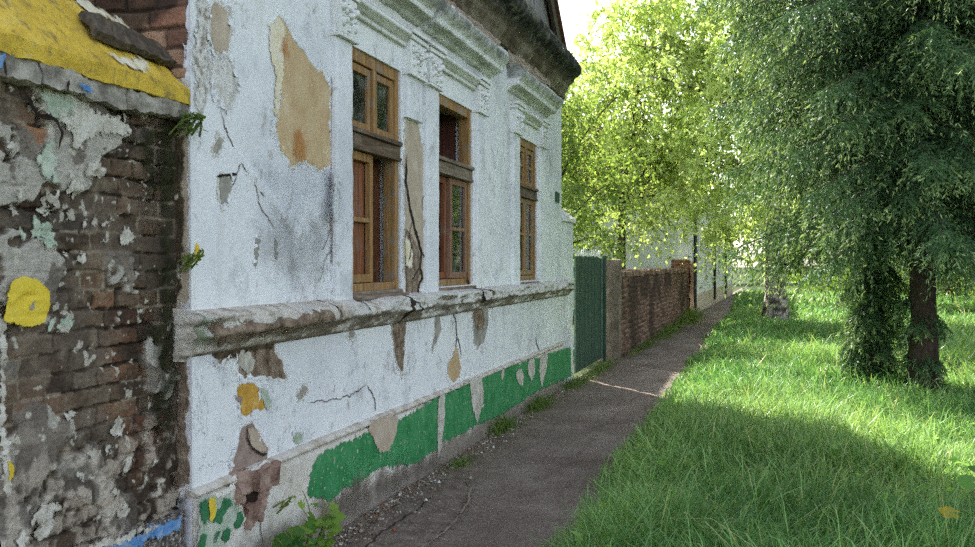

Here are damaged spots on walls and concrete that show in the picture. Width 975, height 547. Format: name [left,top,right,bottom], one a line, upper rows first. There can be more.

peeling [18,139,136,264]
peeling [28,82,132,149]
flaking render [76,0,242,308]
spalling [268,7,343,223]
crack [394,159,425,324]
spalling [401,118,424,293]
peeling [0,276,74,496]
spalling [173,357,191,492]
spalling [197,309,336,547]
crack [311,385,376,411]
peeling [437,343,484,457]
crack [365,478,473,547]